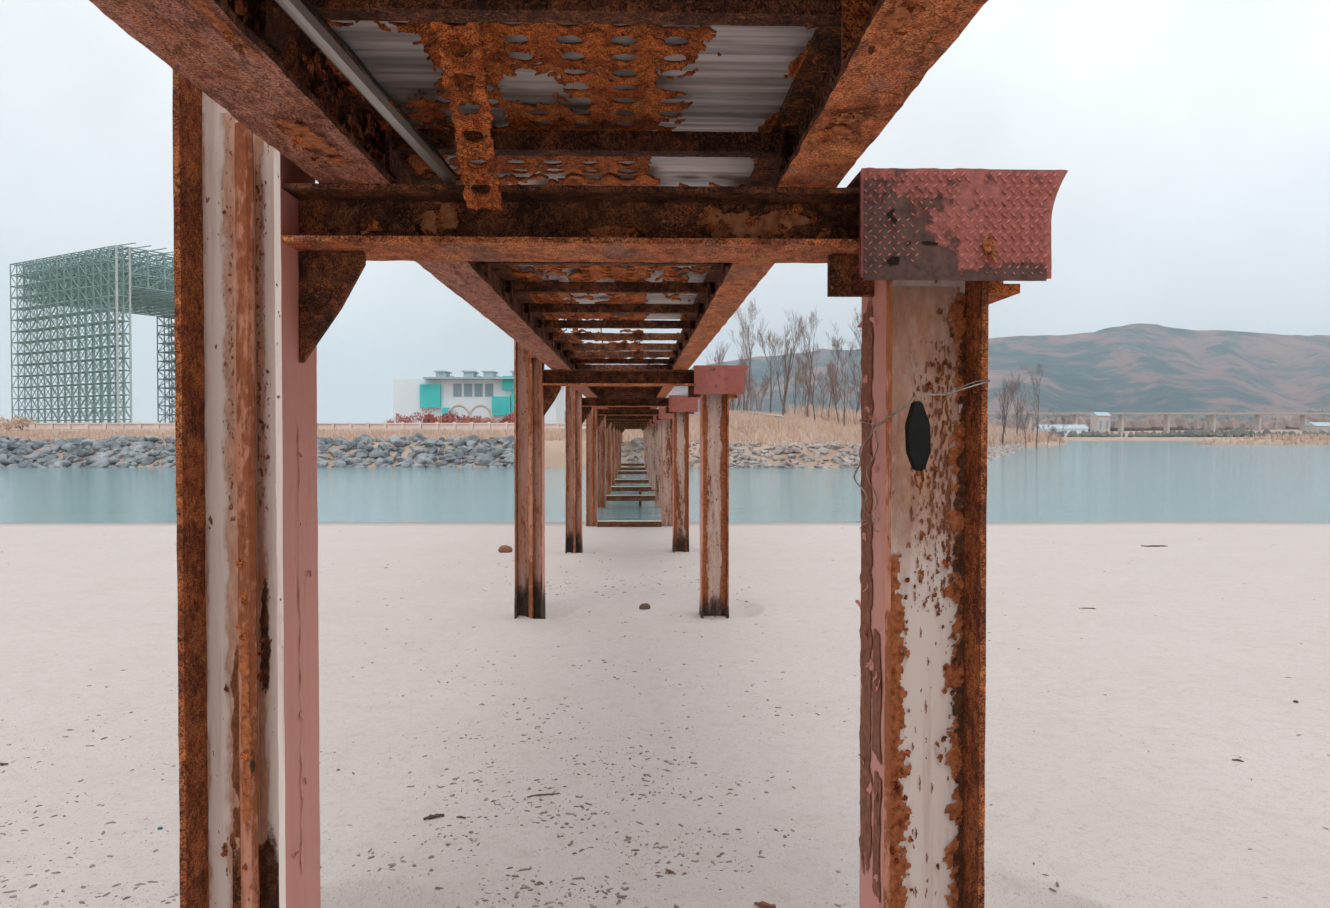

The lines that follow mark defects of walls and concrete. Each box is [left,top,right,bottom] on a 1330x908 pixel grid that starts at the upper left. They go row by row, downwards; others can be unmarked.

corrosion [864,0,926,56]
corrosion [186,0,391,177]
corrosion [404,201,460,236]
corrosion [587,224,639,238]
corrosion [661,203,831,239]
corrosion [216,113,279,908]
corrosion [855,179,1047,908]